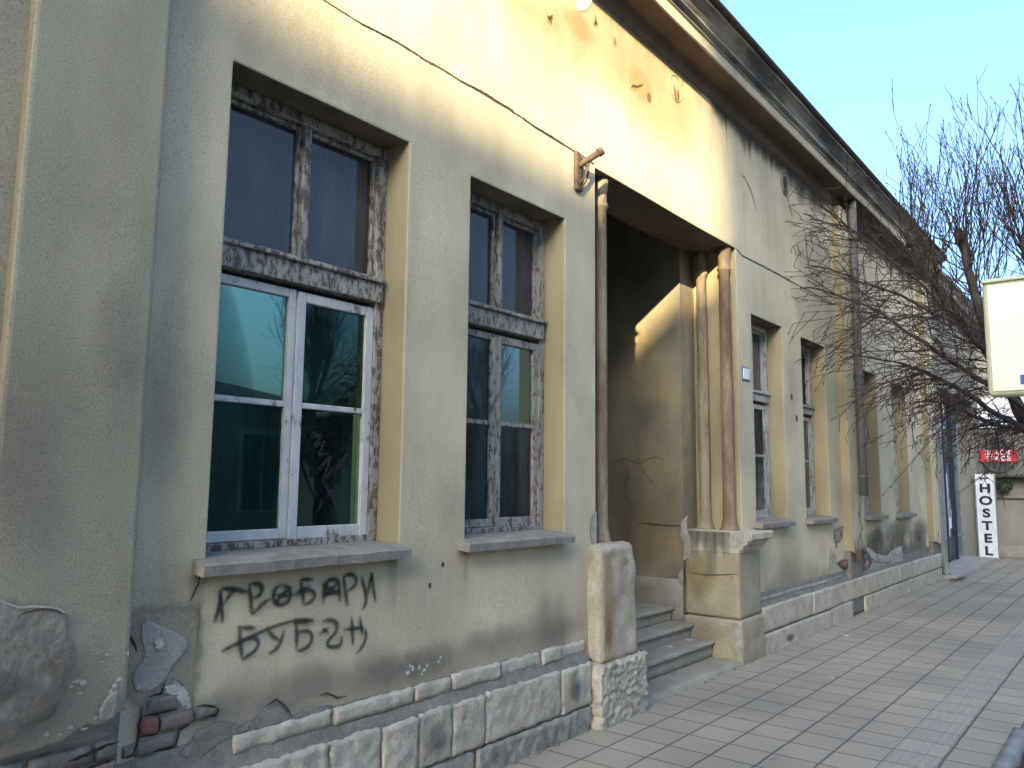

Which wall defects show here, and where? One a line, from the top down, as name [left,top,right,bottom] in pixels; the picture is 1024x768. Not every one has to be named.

damp [712,101,826,205]
crack [610,457,733,591]
spalling [678,515,691,584]
peeling [833,527,843,548]
flaking render [858,503,903,570]
crack [190,576,200,642]
spalling [0,598,102,746]
flaking render [0,678,219,768]